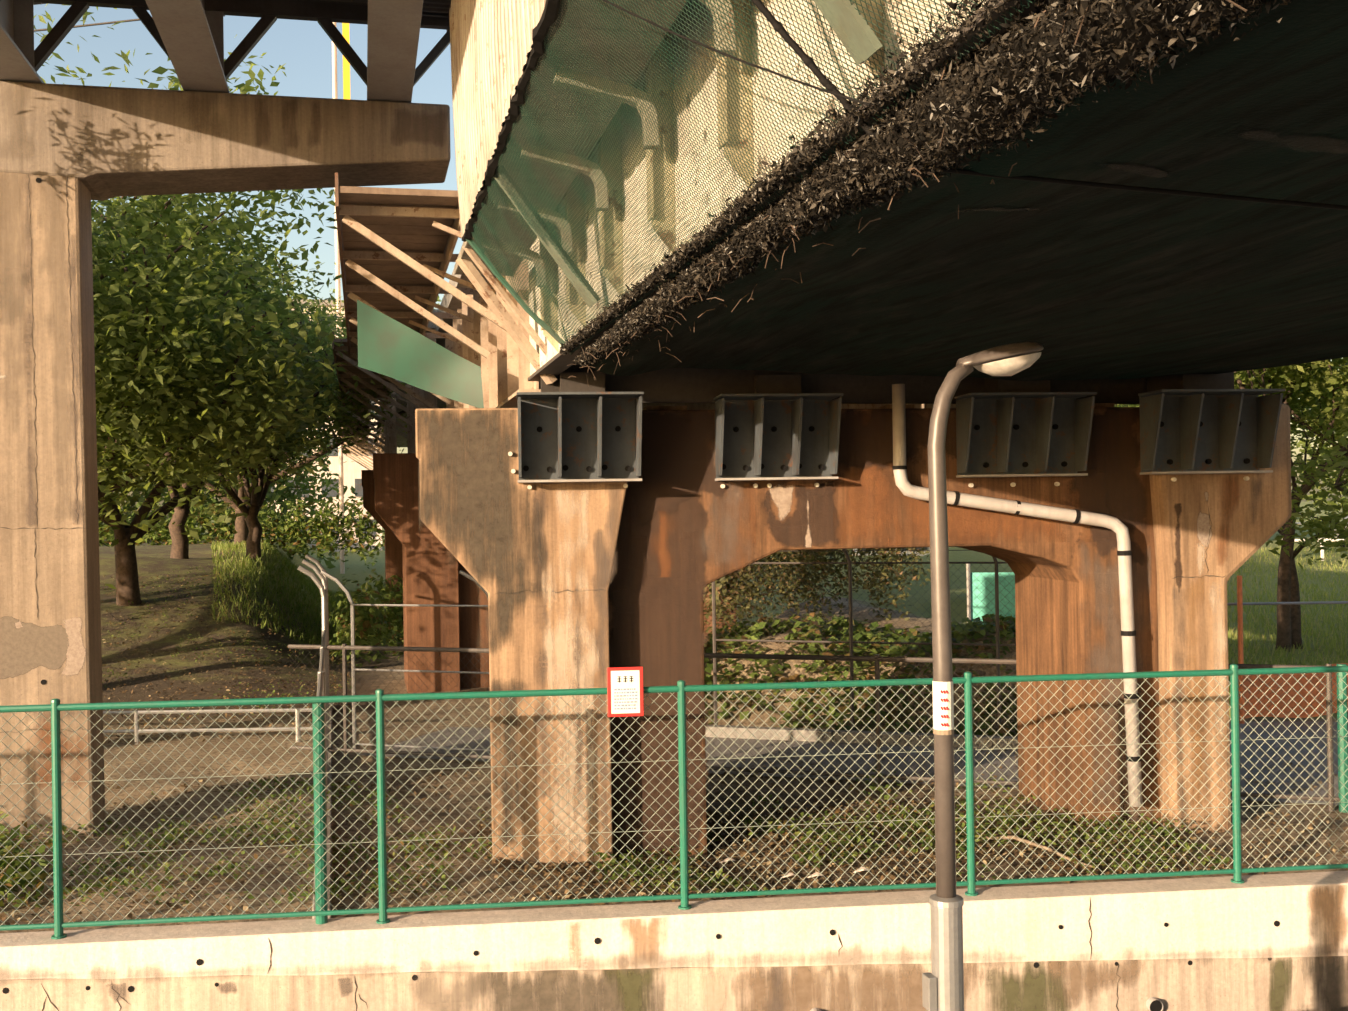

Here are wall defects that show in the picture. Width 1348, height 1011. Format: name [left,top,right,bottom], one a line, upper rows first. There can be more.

crack [1,175,79,620]
leakage [1174,503,1182,592]
spalling [1197,492,1212,568]
spalling [0,616,86,679]
crack [1088,900,1121,1011]
leakage [1269,887,1348,1011]